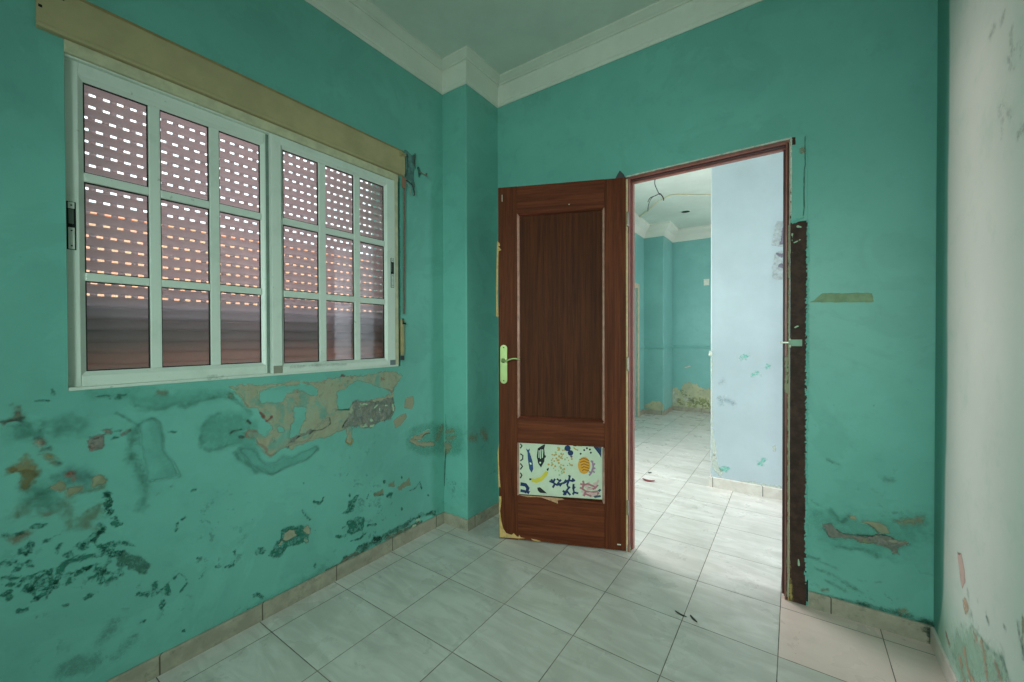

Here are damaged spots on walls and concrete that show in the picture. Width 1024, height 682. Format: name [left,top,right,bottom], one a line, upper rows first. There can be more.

flaking render [228,370,415,458]
flaking render [644,351,729,476]
flaking render [7,455,38,490]
peeling [0,472,187,613]
peeling [256,512,311,557]
flaking render [314,476,436,571]
flaking render [823,516,908,554]
flaking render [958,554,968,614]